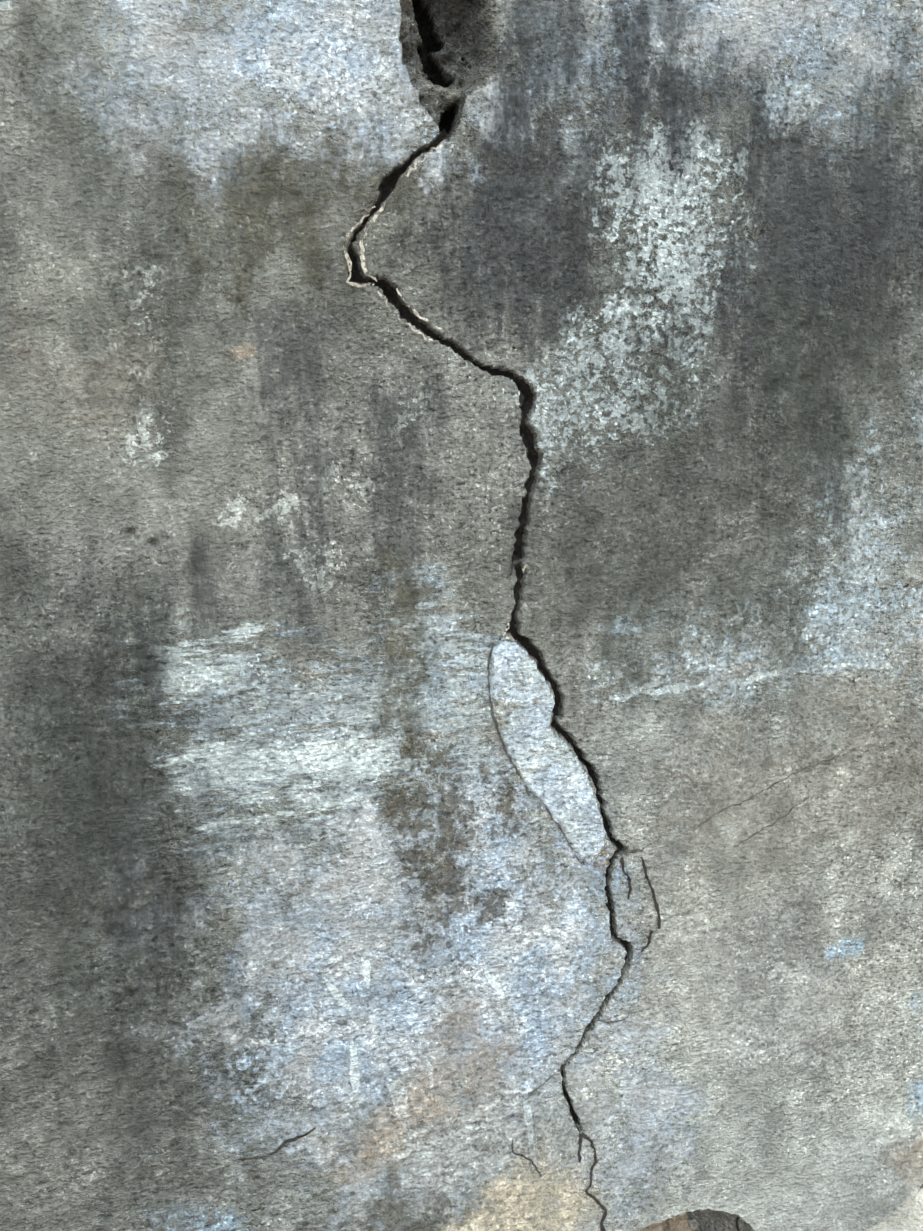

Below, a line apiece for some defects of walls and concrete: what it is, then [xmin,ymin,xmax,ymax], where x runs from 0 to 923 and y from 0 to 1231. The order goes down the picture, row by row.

peeling [45,0,923,195]
water stain [431,0,923,493]
water stain [122,262,173,468]
water stain [217,387,433,531]
water stain [283,538,346,591]
crack [343,128,661,970]
crack [596,1009,635,1023]
crack [512,1139,541,1176]
crack [523,1061,607,1231]